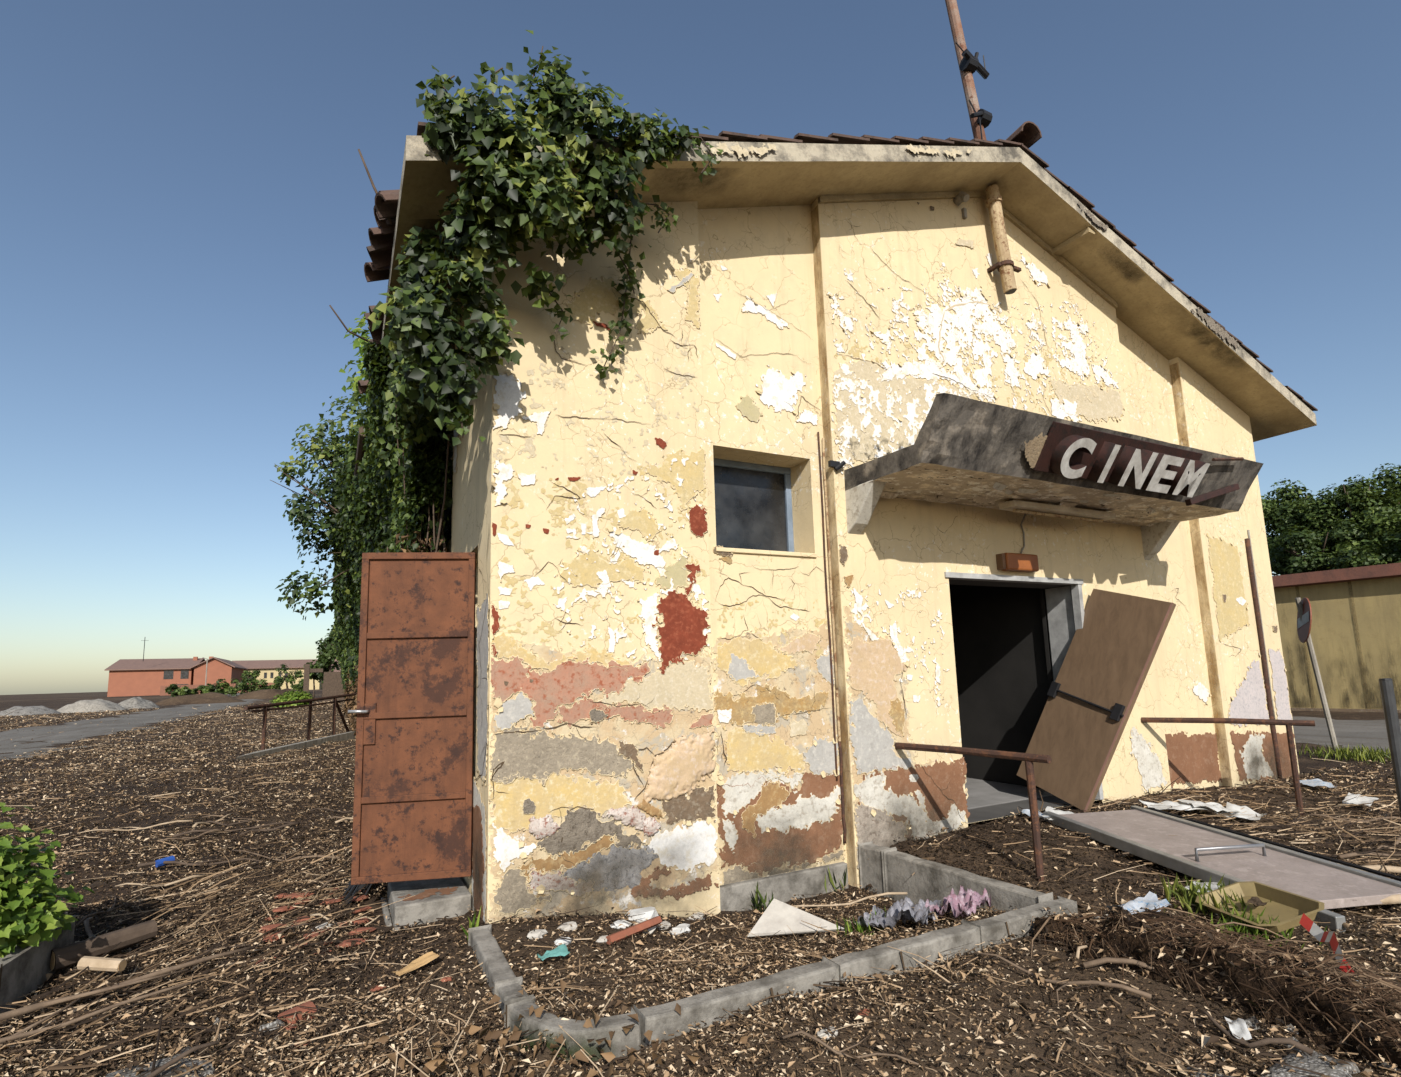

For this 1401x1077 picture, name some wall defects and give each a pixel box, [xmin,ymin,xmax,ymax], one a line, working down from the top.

crack [612,287,888,383]
peeling [736,238,1126,474]
crack [558,415,672,509]
peeling [1206,533,1250,642]
peeling [1130,625,1298,794]